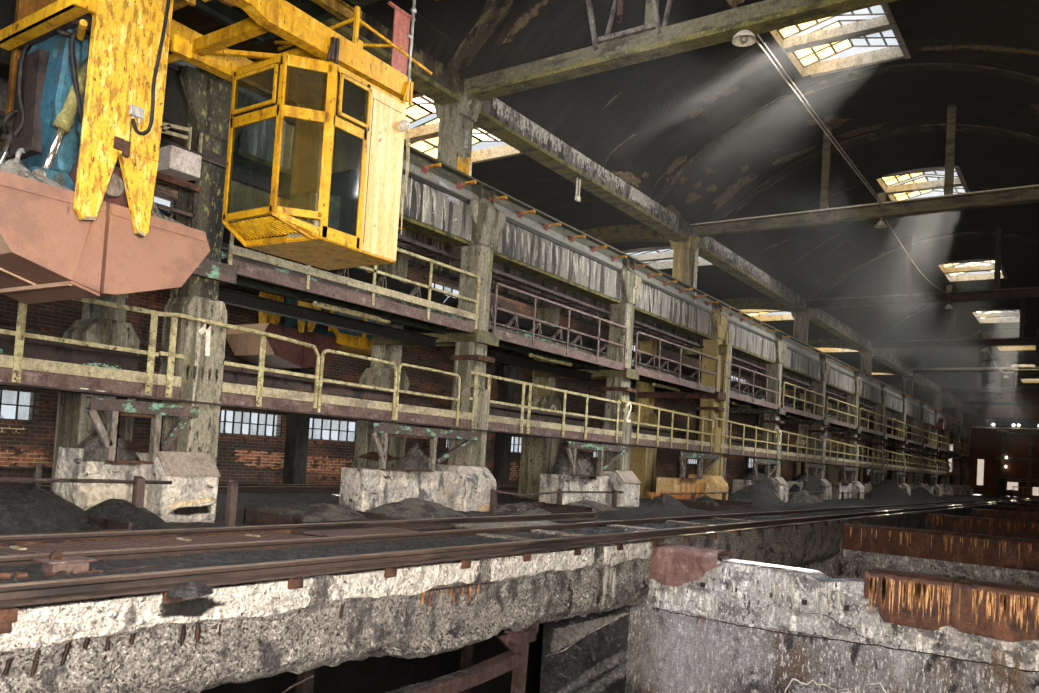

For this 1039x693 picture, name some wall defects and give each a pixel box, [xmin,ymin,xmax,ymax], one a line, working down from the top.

rust [850,526,911,546]
rust [931,516,1039,563]
spalling [420,582,486,606]
rust [869,576,1039,630]
spalling [160,597,225,646]
spalling [30,648,41,677]
spalling [59,638,90,666]